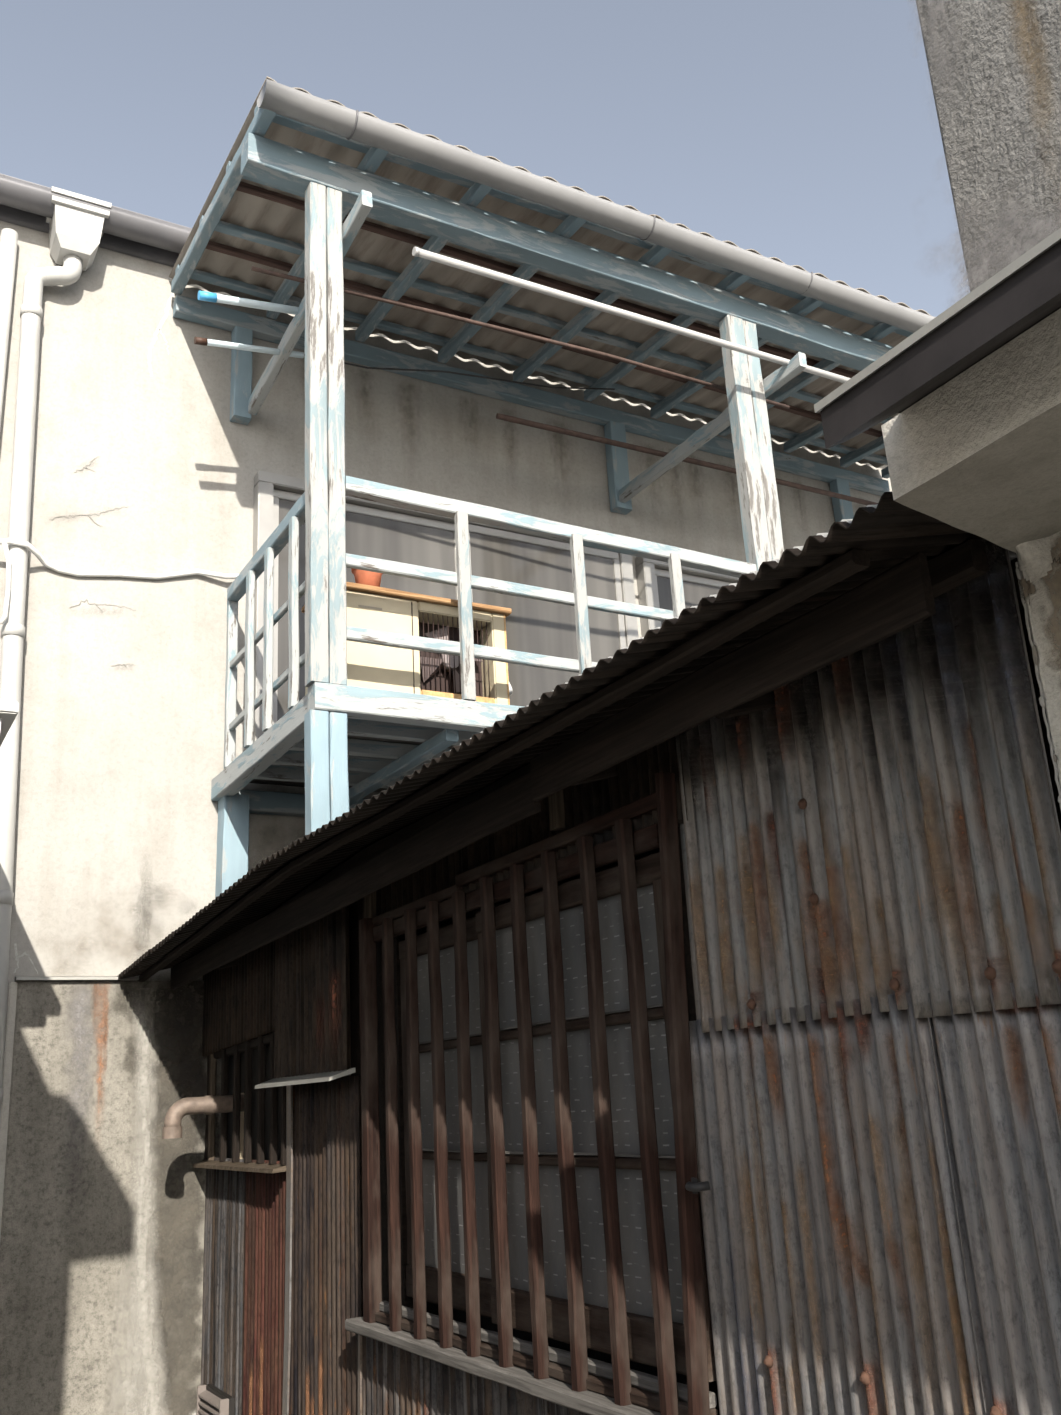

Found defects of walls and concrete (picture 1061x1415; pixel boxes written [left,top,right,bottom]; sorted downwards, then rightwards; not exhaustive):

spalling [1015,562,1061,809]
corrosion [818,969,869,1065]
corrosion [1001,998,1058,1113]
damp [115,980,207,1415]
corrosion [808,1041,872,1289]
corrosion [249,1347,264,1415]
corrosion [864,1367,882,1415]